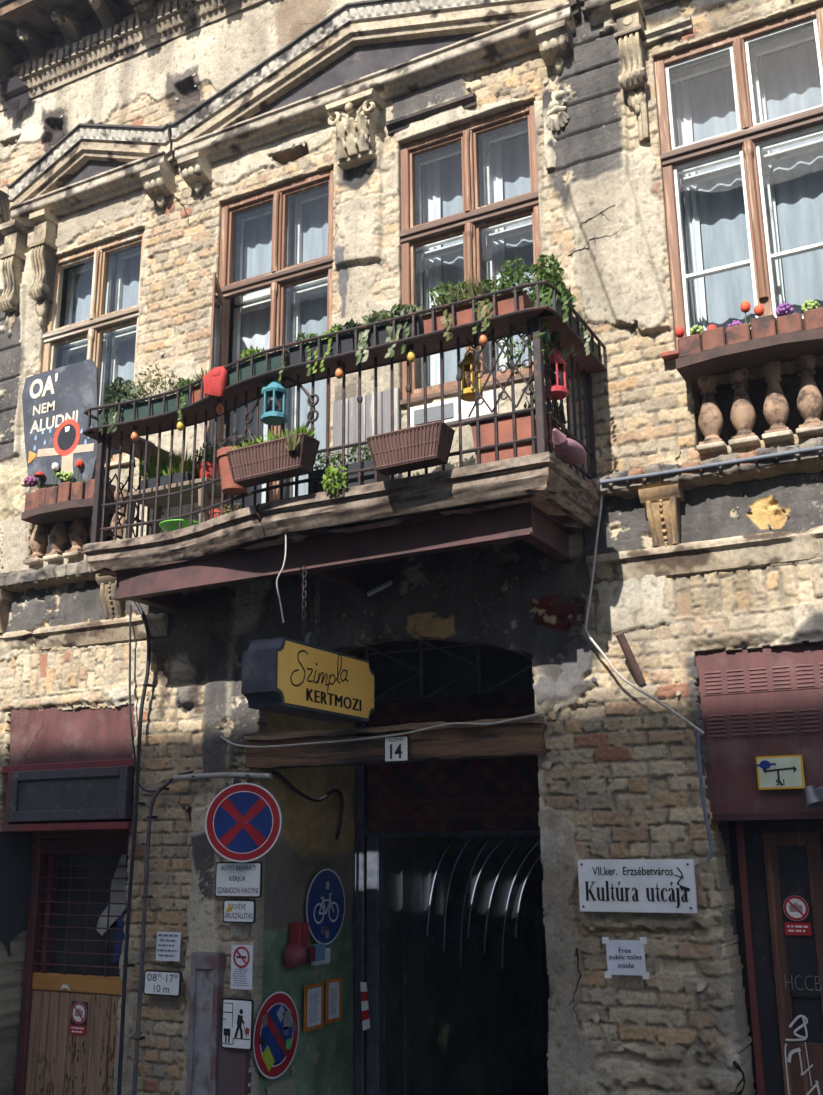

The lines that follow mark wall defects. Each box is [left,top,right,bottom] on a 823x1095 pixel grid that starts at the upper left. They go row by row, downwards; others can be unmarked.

peeling [731,494,791,529]
peeling [407,609,456,638]
spalling [530,591,711,866]
crack [726,1061,745,1095]